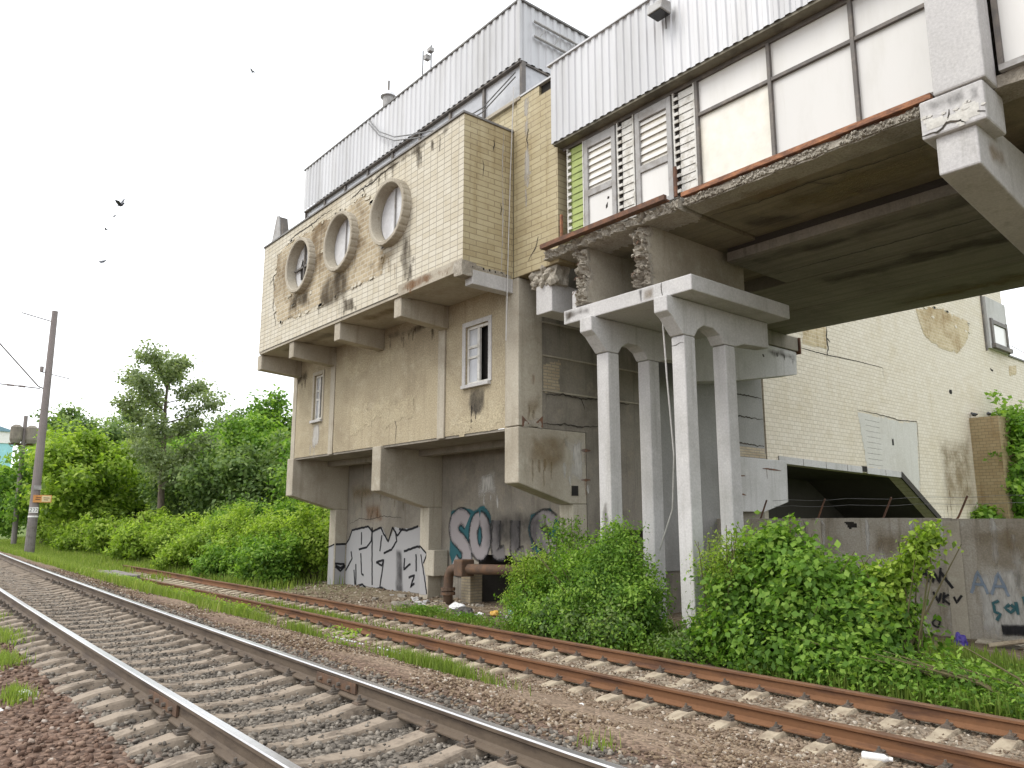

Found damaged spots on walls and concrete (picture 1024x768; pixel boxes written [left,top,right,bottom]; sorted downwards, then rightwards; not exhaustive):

spalling [682,99,987,206]
crack [713,110,986,215]
damp [292,275,356,313]
crack [802,327,884,375]
damp [471,393,483,419]
crack [544,393,629,428]
crack [737,393,764,447]